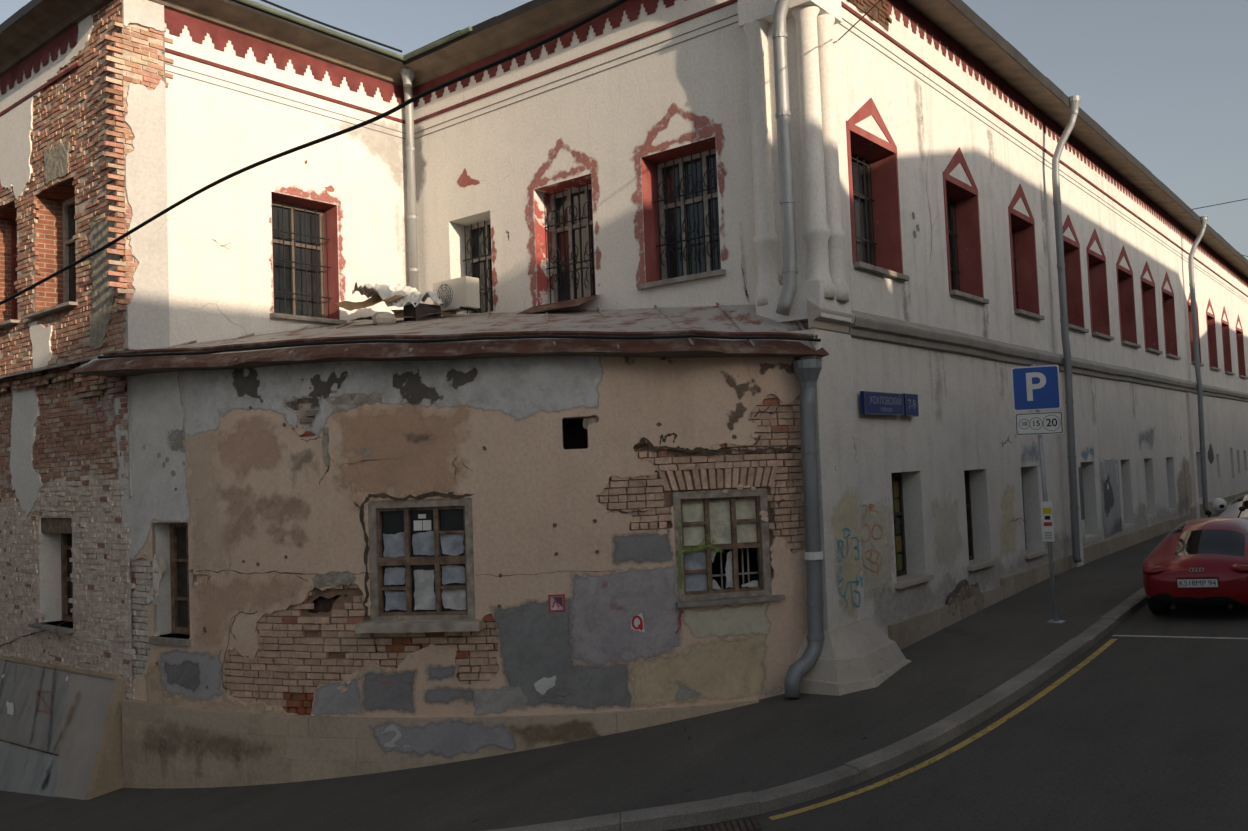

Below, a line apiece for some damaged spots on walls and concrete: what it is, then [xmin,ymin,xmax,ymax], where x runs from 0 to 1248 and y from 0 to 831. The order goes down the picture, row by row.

peeling [632,103,726,290]
spalling [0,0,602,715]
crack [190,554,307,581]
crack [301,434,433,485]
crack [343,455,474,617]
spalling [593,357,806,581]